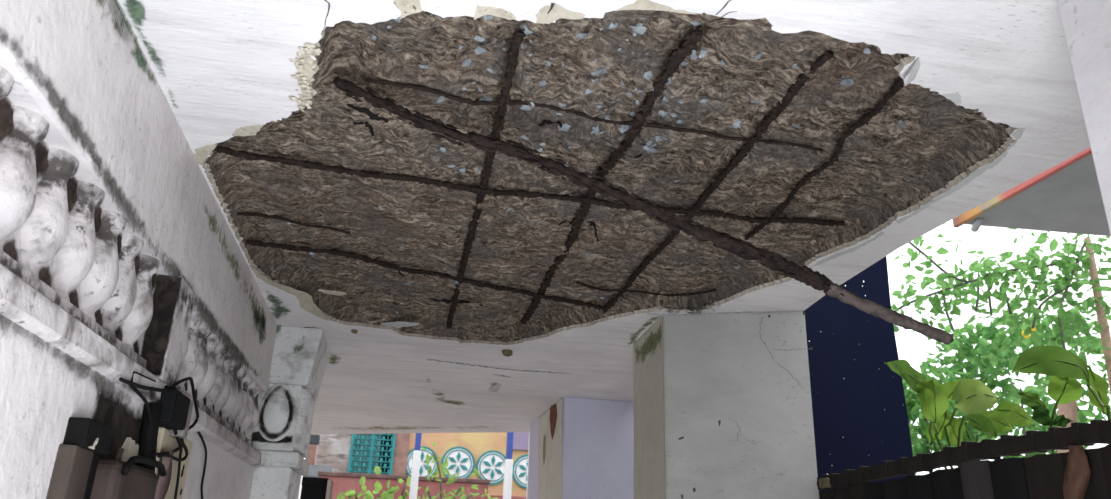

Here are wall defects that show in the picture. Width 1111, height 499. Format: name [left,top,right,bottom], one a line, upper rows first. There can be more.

spalling [194,0,1025,345]